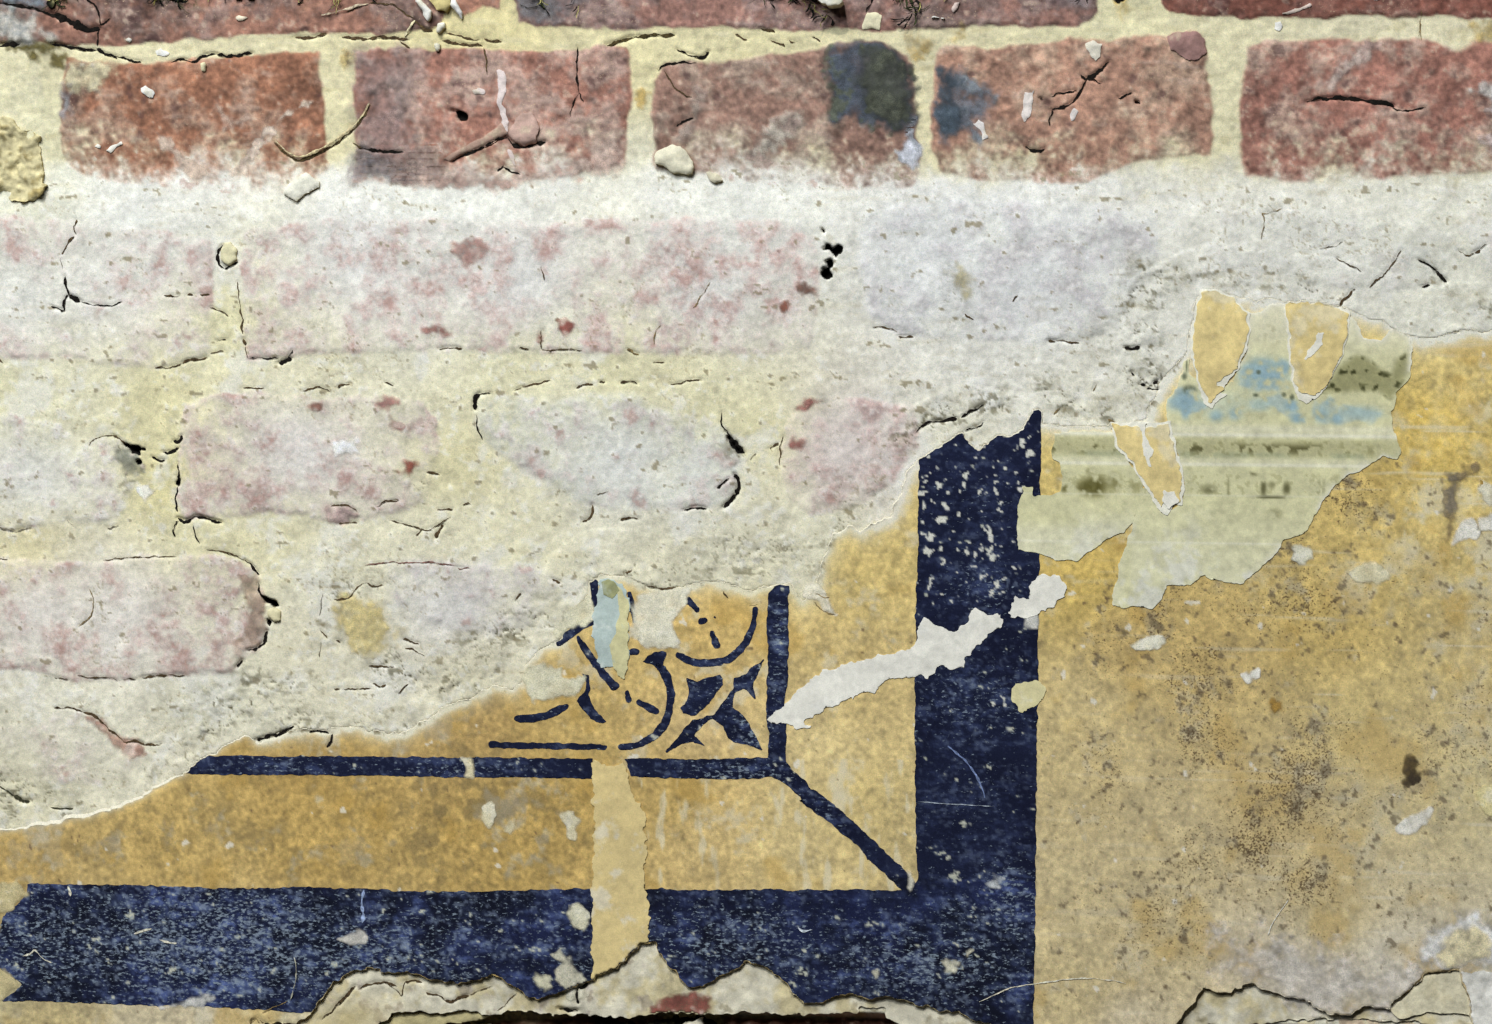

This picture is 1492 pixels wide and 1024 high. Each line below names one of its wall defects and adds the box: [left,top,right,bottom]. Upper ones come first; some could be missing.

peeling [1167,31,1207,60]
spalling [0,116,48,202]
crack [51,220,122,312]
spalling [821,244,843,279]
crack [156,245,349,391]
crack [472,326,700,438]
crack [67,435,268,667]
crack [319,471,470,655]
peeling [553,597,594,638]
peeling [630,587,691,648]
crack [257,726,333,747]
peeling [534,950,589,1001]